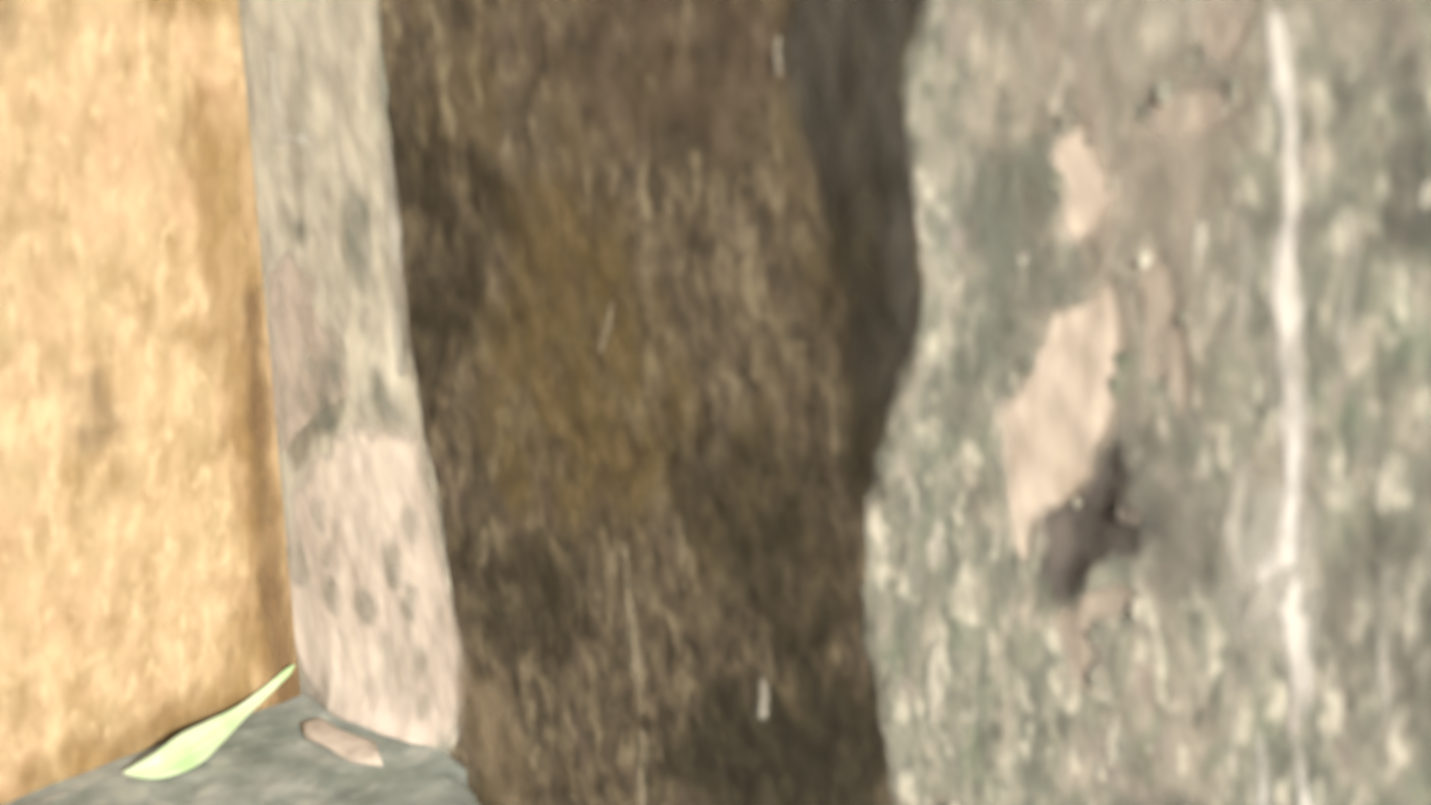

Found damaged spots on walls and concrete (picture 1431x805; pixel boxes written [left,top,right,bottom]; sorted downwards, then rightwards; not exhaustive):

peeling [1136,77,1245,134]
peeling [1050,112,1120,239]
damp [1226,12,1311,732]
peeling [1002,249,1189,687]
damp [1298,767,1311,805]